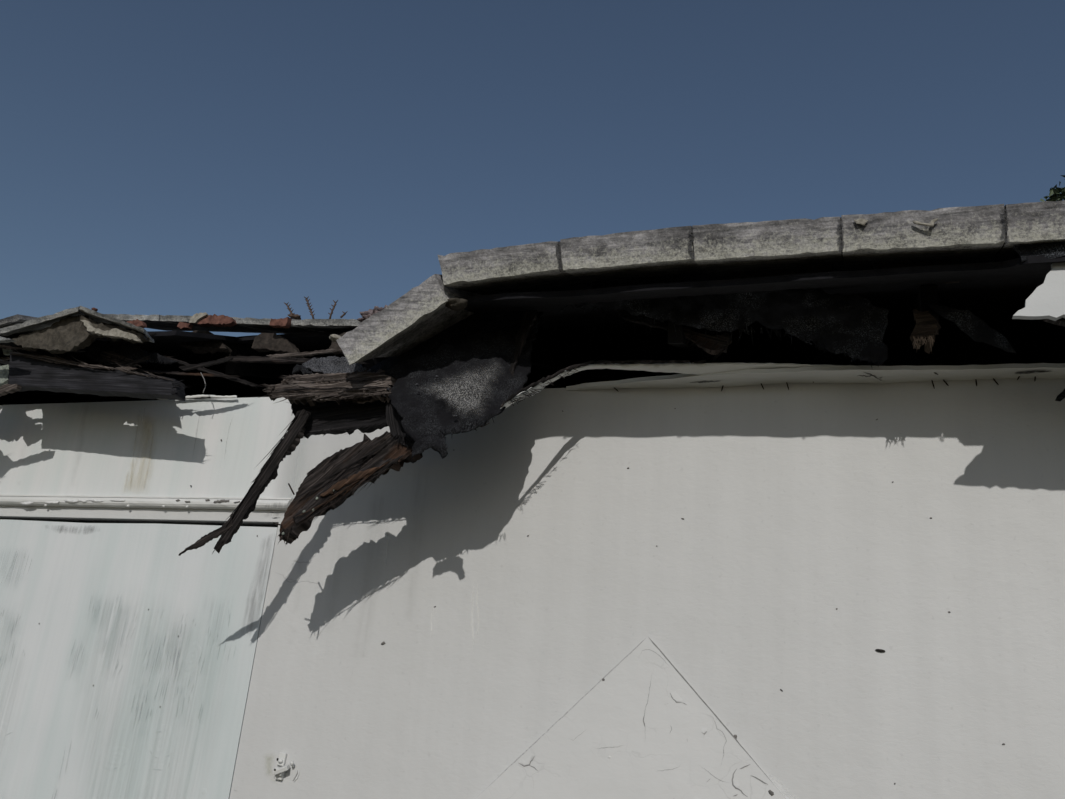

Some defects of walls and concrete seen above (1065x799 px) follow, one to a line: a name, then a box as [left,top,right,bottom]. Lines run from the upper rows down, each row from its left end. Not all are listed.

crack [649,638,773,796]